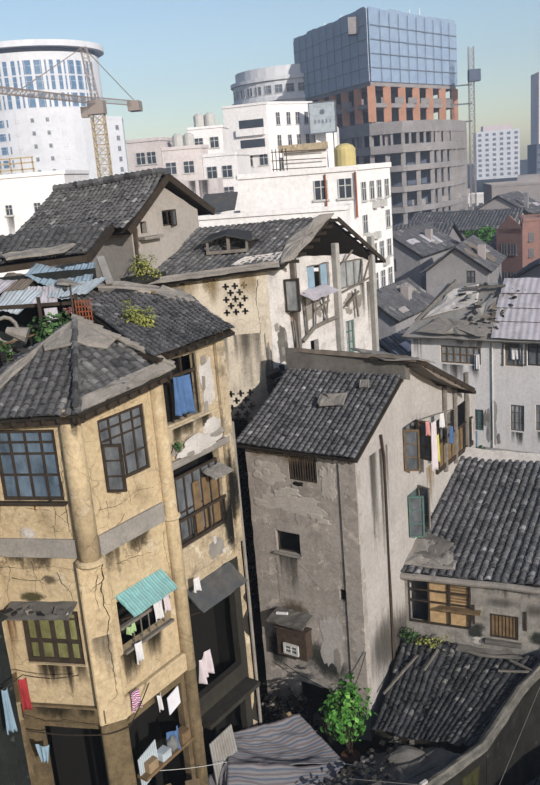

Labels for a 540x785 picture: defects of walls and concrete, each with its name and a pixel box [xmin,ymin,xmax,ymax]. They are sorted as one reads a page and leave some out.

peeling [198,354,215,413]
spalling [171,427,226,468]
crack [25,451,72,537]
peeling [252,460,337,525]
crack [0,557,75,601]
crack [95,533,172,691]
damp [39,665,85,676]
damp [271,634,285,661]
damp [311,645,345,677]